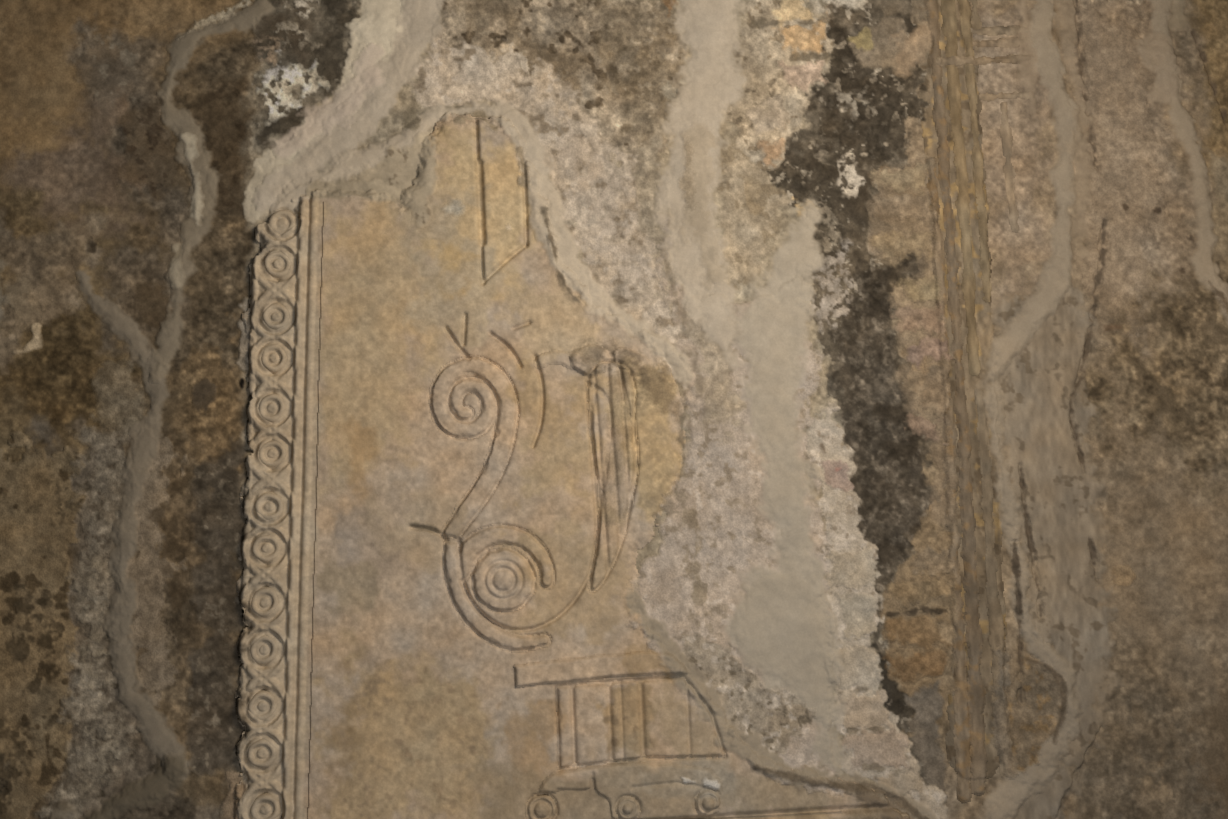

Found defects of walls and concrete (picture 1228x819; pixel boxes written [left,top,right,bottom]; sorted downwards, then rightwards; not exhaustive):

crack [42,0,276,819]
spalling [400,107,423,134]
spalling [442,0,684,165]
crack [660,241,713,494]
spalling [624,225,818,766]
flaking render [716,0,837,306]
damp [766,0,936,593]
flaking render [799,151,963,819]
crack [977,0,1124,819]
crack [1127,0,1228,327]
crack [623,586,940,819]
damp [871,624,917,758]